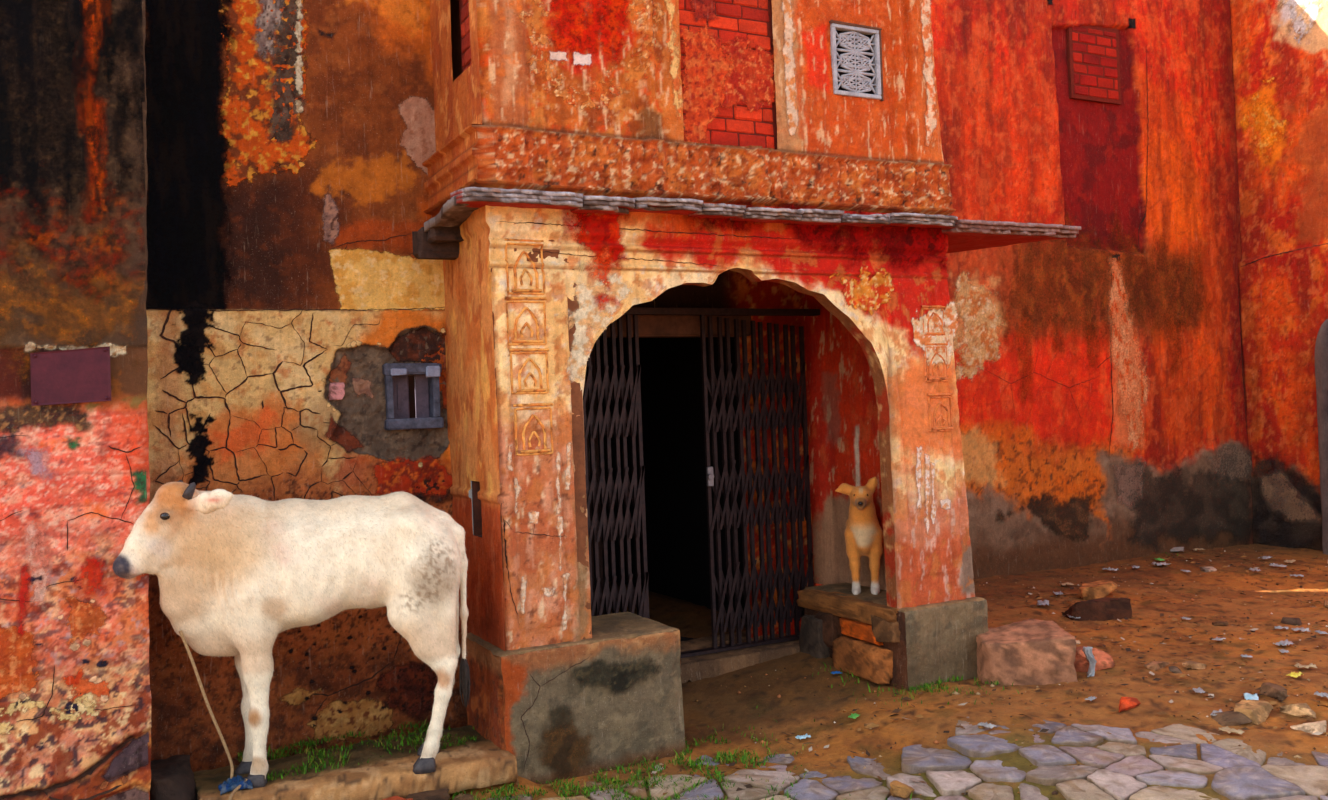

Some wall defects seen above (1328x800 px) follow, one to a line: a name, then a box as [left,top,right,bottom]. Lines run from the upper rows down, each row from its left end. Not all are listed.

leakage [0,0,234,385]
flaking render [322,194,450,467]
leakage [1002,220,1204,449]
leakage [183,414,216,485]
crack [0,306,443,602]
leakage [997,493,1095,542]
leakage [1129,452,1322,552]
leakage [573,658,660,694]